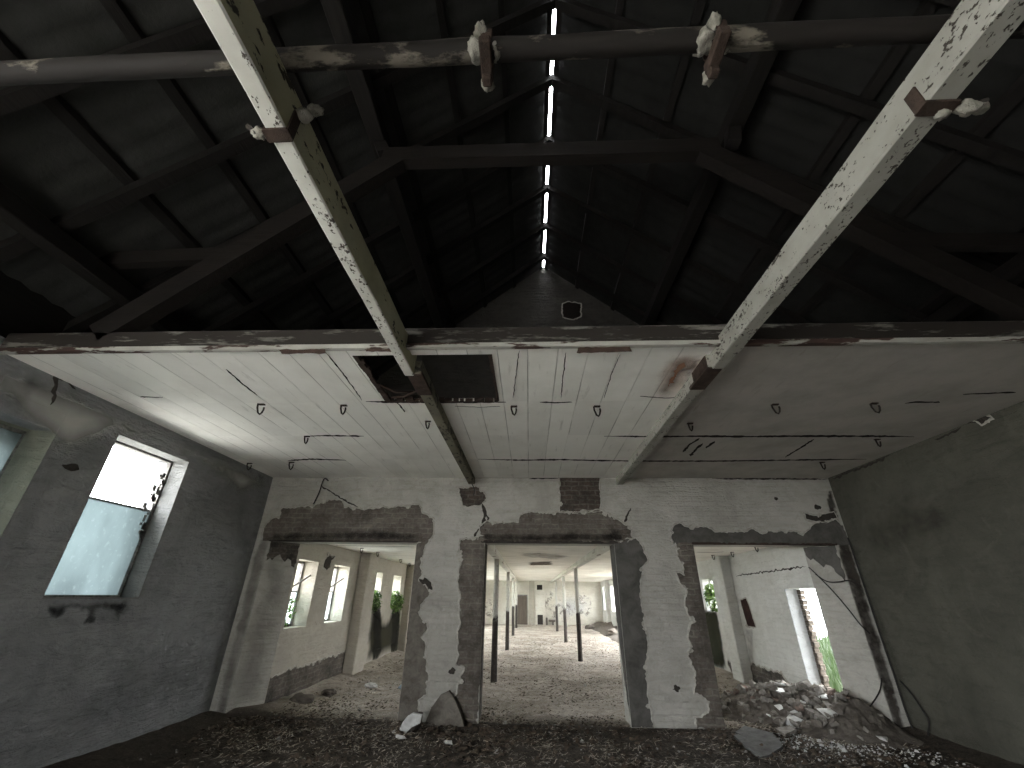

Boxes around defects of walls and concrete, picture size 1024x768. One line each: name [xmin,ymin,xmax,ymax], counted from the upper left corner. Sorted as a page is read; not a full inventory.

spalling [353,349,424,403]
crack [326,351,520,412]
spalling [439,354,499,403]
rust [663,360,689,391]
crack [905,392,1016,440]
flaking render [973,415,994,426]
crack [485,435,909,480]
crack [322,486,358,507]
flaking render [261,498,437,721]
flaking render [448,478,655,728]
flaking render [669,504,849,729]